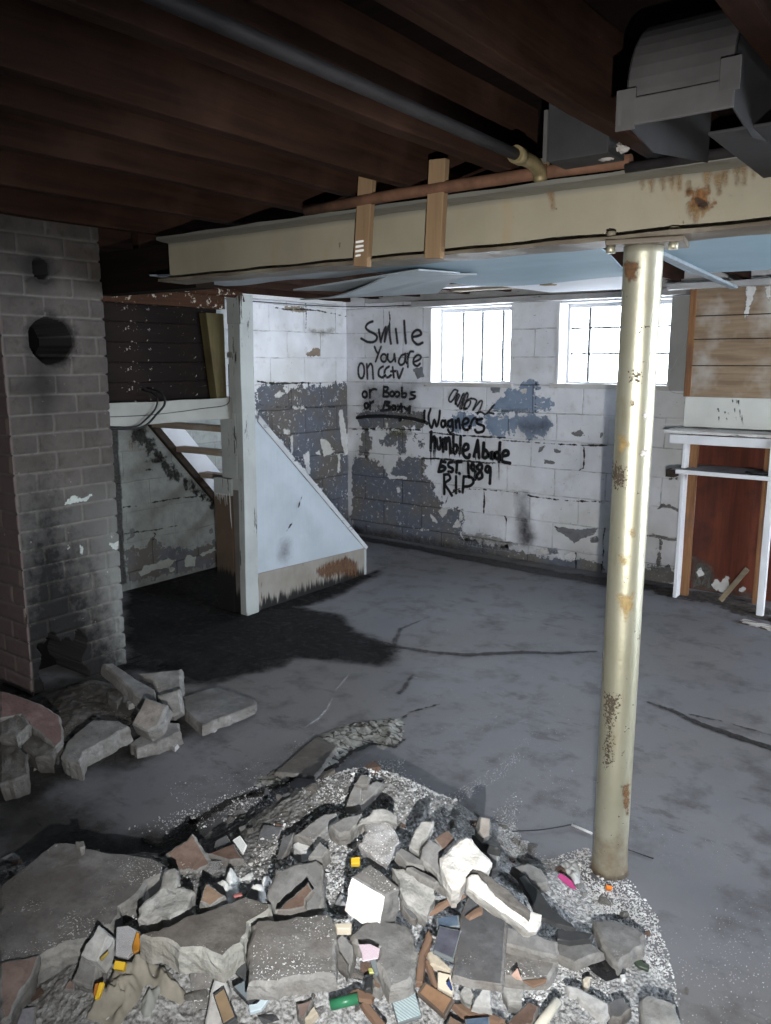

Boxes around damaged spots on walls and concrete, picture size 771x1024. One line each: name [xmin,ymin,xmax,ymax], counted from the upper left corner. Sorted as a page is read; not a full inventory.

corrosion [662,168,754,218]
peeling [65,494,93,505]
peeling [255,379,605,573]
peeling [108,528,217,582]
corrosion [316,556,358,578]
crack [366,622,596,656]
crack [323,704,439,772]
corrosion [602,691,622,770]
crack [648,701,771,750]
crack [142,777,296,849]